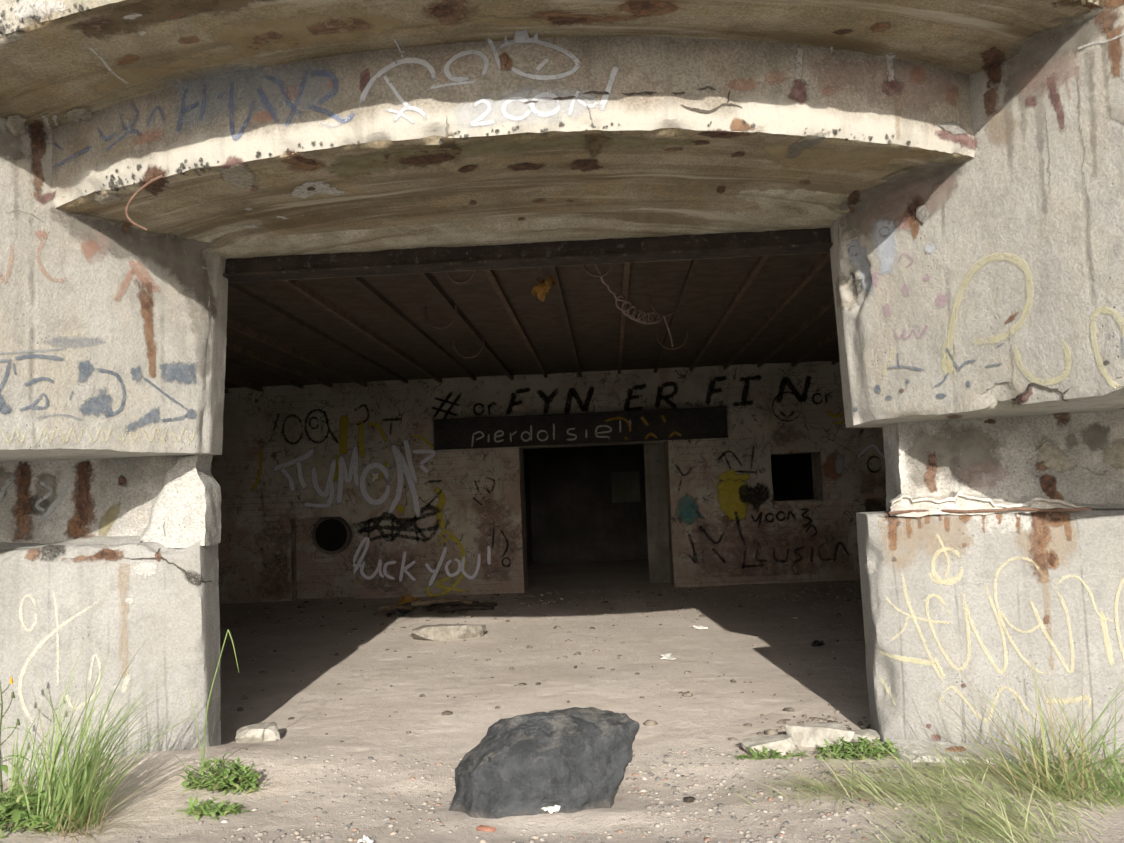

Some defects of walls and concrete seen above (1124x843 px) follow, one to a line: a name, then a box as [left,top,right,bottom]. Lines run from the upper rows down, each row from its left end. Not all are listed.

corrosion [423,0,678,27]
corrosion [1078,7,1124,80]
corrosion [980,47,1007,114]
corrosion [1025,75,1065,128]
corrosion [28,120,55,204]
corrosion [137,283,156,377]
crack [1012,383,1087,405]
corrosion [923,452,937,492]
corrosion [11,460,95,561]
crack [121,522,212,586]
corrosion [884,508,1002,562]
corrosion [1016,462,1072,583]